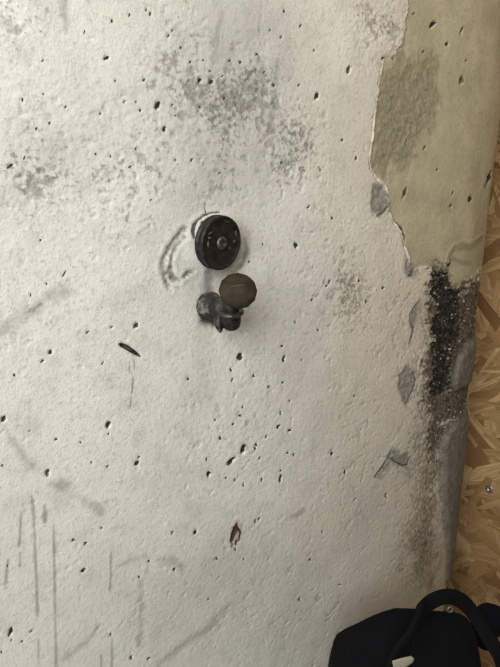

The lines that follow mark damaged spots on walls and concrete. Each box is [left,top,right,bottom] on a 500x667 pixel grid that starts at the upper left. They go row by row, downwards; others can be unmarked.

peeling [368,0,500,459]
rust [230,523,241,547]